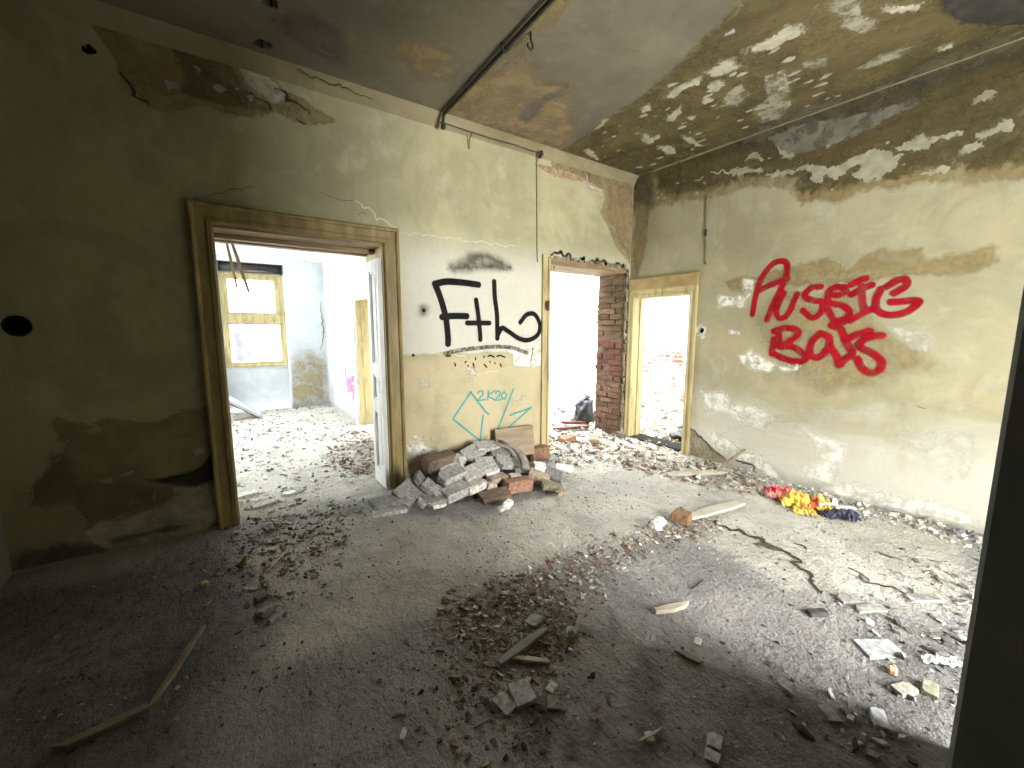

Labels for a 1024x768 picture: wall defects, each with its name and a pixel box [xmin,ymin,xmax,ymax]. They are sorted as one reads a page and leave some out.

crack [297,69,373,100]
leakage [442,0,1024,278]
peeling [534,163,604,197]
crack [323,193,519,247]
peeling [411,346,541,375]
peeling [28,407,217,550]
crack [705,518,823,594]